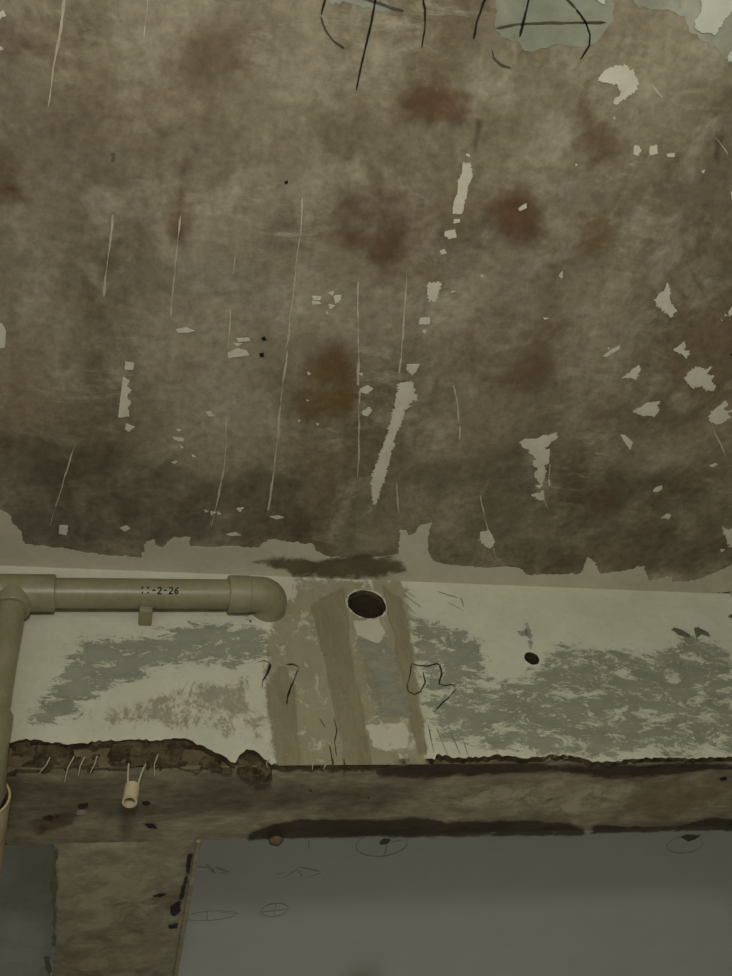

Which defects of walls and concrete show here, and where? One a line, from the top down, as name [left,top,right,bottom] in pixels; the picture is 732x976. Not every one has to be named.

flaking render [0,510,732,593]
spalling [7,740,272,783]
damp [452,780,635,815]
damp [59,863,159,976]